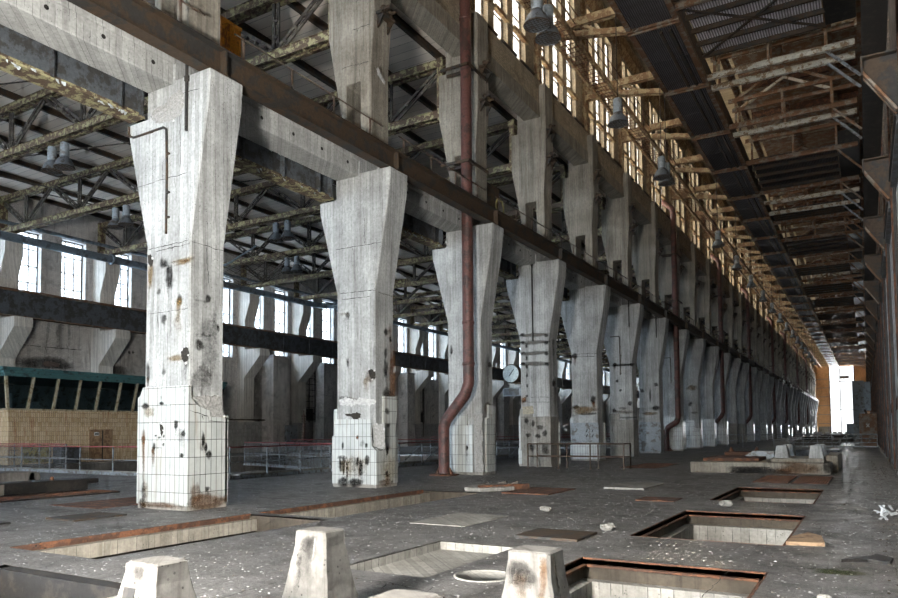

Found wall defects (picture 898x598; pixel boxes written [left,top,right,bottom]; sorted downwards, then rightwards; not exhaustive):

spalling [181,346,189,365]